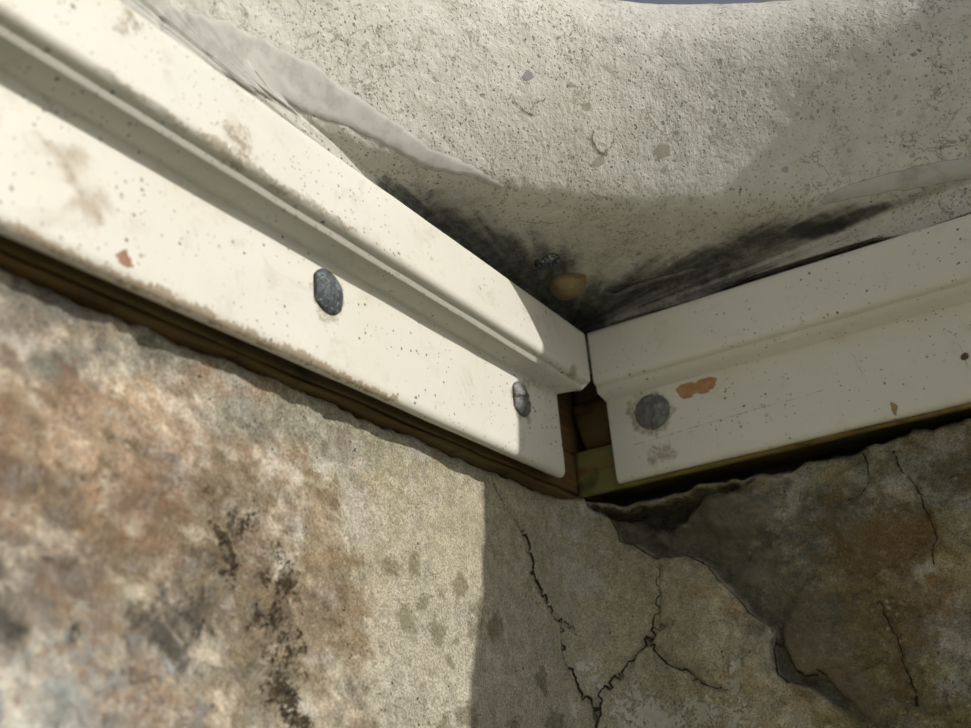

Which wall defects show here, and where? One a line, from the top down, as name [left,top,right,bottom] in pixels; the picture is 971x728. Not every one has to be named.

damp [379,180,888,341]
crack [496,489,733,728]
spalling [588,483,828,687]
crack [846,600,918,707]
crack [893,451,937,564]